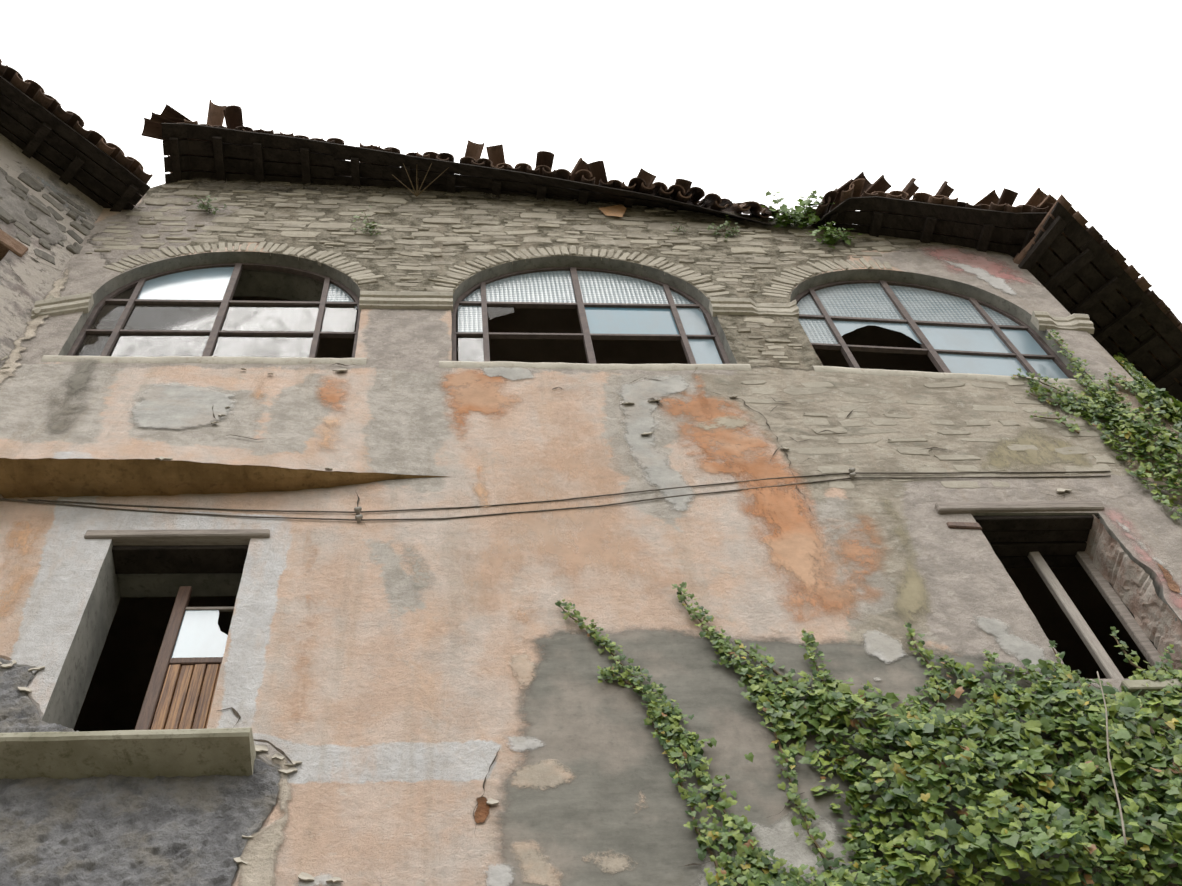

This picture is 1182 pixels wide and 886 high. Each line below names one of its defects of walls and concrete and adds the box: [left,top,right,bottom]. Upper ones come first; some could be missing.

flaking render [947,261,1017,295]
flaking render [620,374,695,511]
crack [693,370,858,514]
flaking render [1119,523,1182,594]
flaking render [0,658,80,733]
flaking render [0,739,302,886]
flaking render [473,617,1076,886]